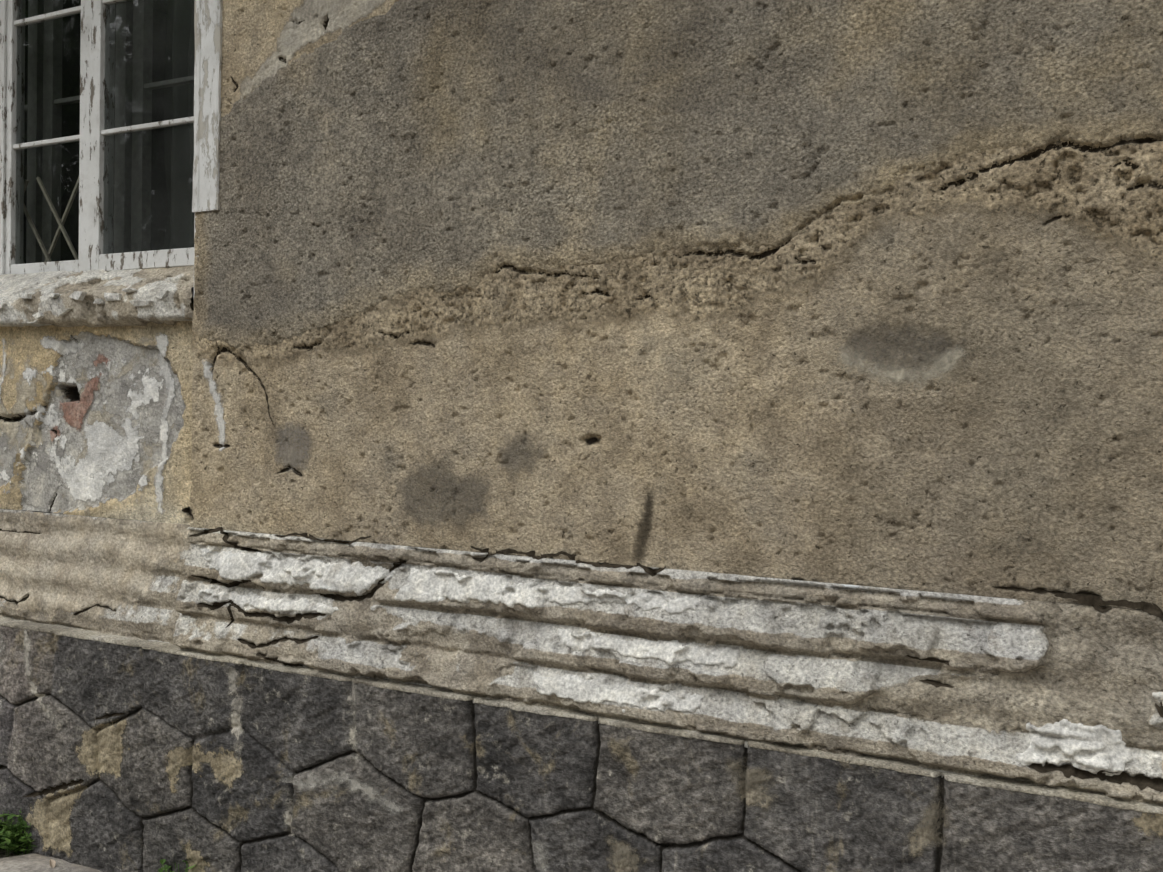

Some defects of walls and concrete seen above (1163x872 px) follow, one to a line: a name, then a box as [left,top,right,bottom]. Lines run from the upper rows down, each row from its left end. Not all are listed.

peeling [0,288,169,320]
crack [211,346,273,424]
spalling [0,331,186,514]
peeling [198,548,700,615]
peeling [556,628,740,669]
peeling [533,672,705,713]
peeling [1015,719,1133,776]